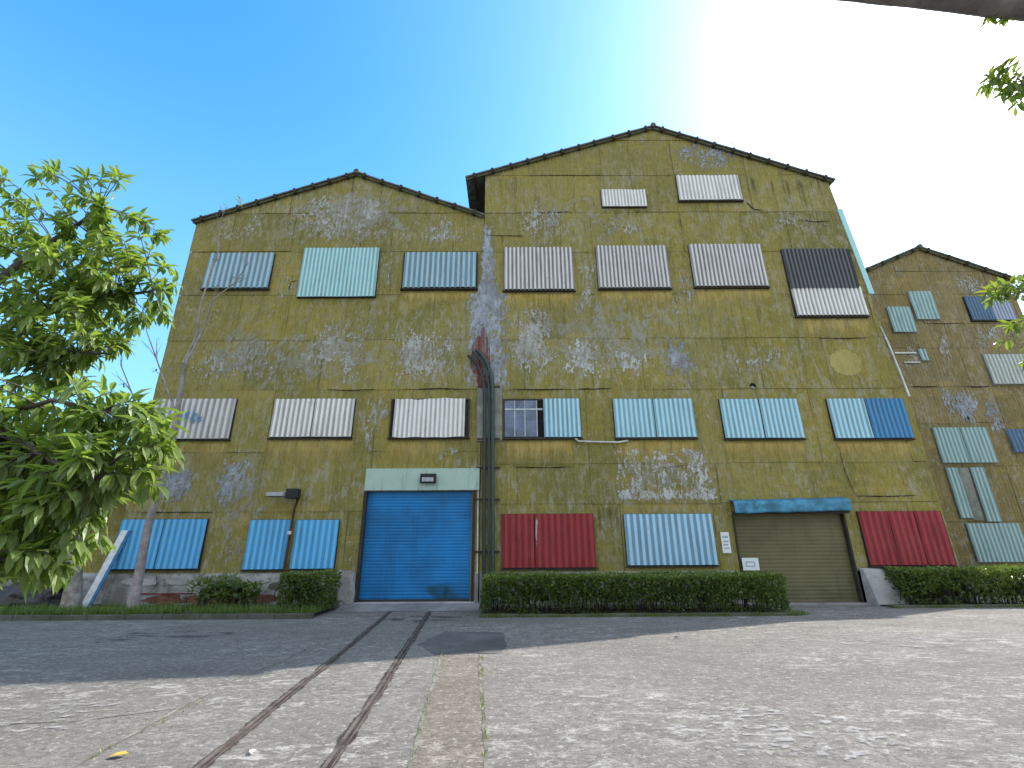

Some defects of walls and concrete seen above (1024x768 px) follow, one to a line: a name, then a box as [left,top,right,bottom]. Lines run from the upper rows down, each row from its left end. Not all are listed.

peeling [175,187,701,388]
corrosion [471,327,491,386]
peeling [941,389,1005,442]
peeling [161,468,192,502]
peeling [206,451,265,559]
peeling [614,446,721,503]